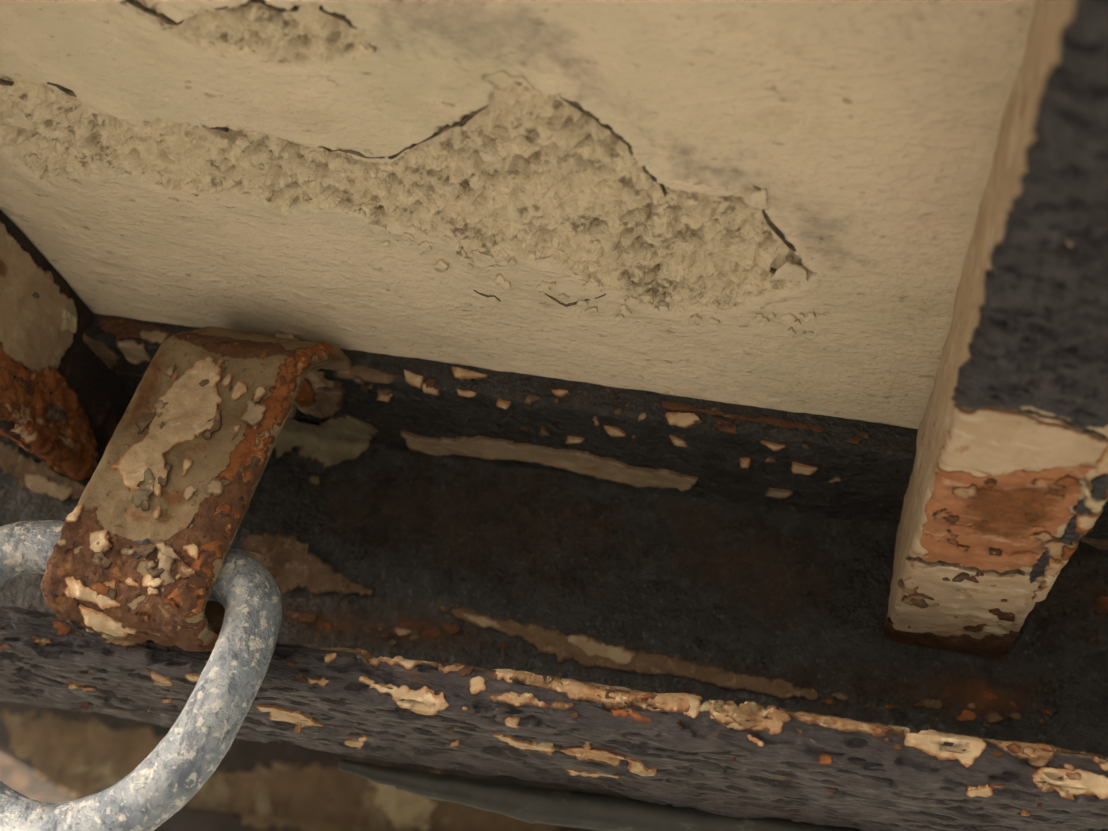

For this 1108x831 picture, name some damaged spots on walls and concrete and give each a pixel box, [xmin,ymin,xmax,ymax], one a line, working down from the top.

spalling [107,0,377,64]
spalling [0,70,810,324]
peeling [0,222,181,373]
peeling [893,0,1108,642]
rust [0,344,100,481]
rust [41,333,335,652]
peeling [400,426,698,492]
rust [921,462,1094,574]
peeling [31,576,148,646]
peeling [252,700,323,733]
peeling [359,603,1108,816]
peeling [187,759,561,831]